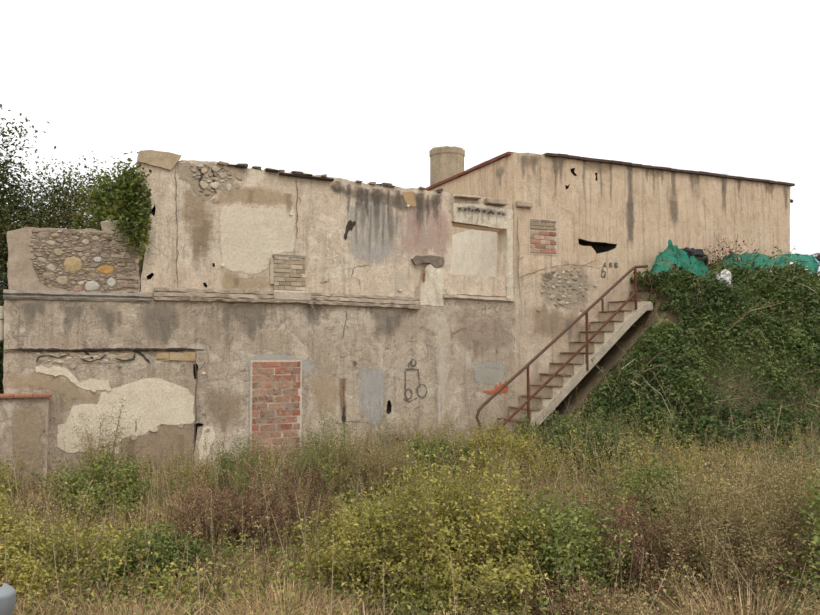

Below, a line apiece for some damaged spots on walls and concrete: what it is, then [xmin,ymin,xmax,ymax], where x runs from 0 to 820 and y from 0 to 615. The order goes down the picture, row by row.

crack [173,166,181,288]
peeling [177,162,296,275]
crack [294,182,302,236]
damp [331,181,449,261]
flaking render [541,265,597,311]
peeling [29,351,195,454]
flaking render [198,426,215,464]